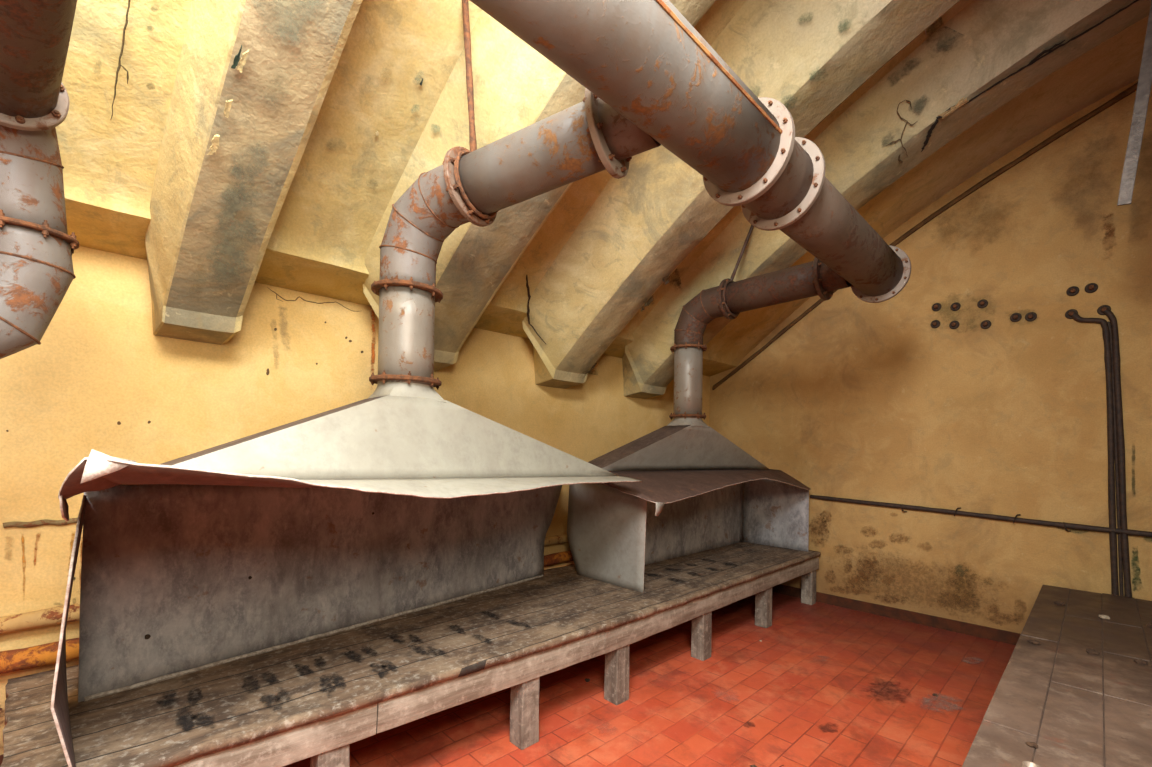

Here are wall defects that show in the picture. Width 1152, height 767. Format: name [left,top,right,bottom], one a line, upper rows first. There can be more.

crack [110,0,130,120]
crack [886,0,1139,163]
water stain [213,144,266,284]